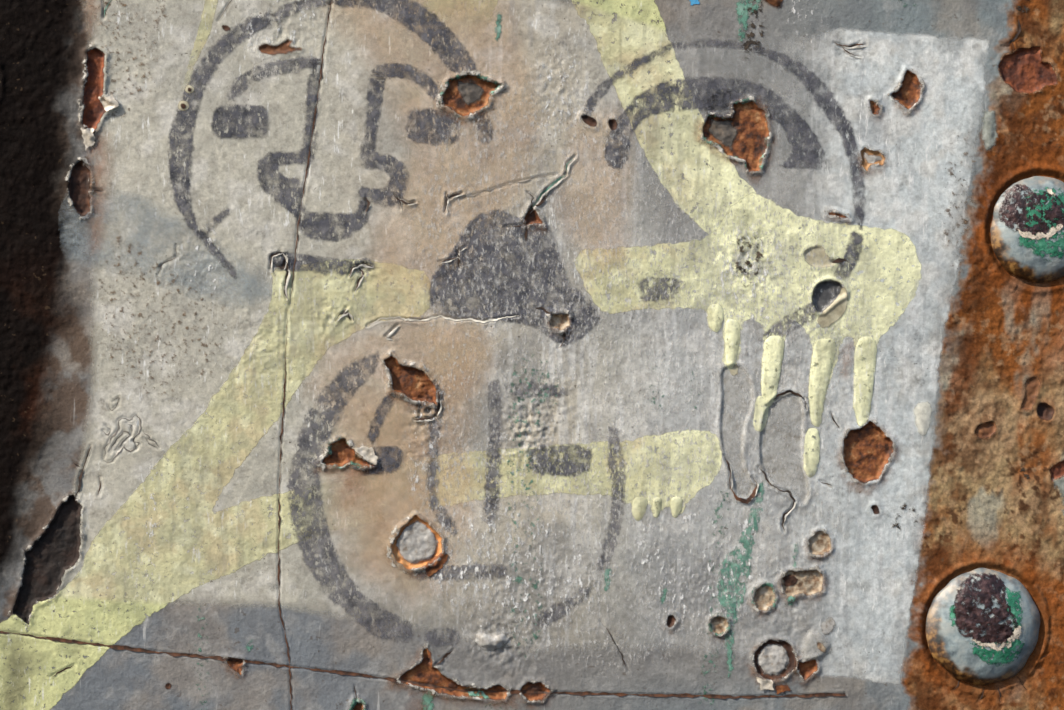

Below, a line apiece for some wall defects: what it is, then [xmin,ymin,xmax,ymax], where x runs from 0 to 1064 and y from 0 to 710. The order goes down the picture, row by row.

crack [836,42,866,58]
peeling [436,68,509,121]
peeling [870,70,925,116]
peeling [66,44,119,220]
peeling [699,96,773,174]
corrosion [999,184,1064,235]
peeling [382,350,441,408]
crack [0,3,846,710]
peeling [841,420,896,484]
peeling [7,447,91,627]
corrosion [953,573,1018,644]
peeling [752,640,819,694]